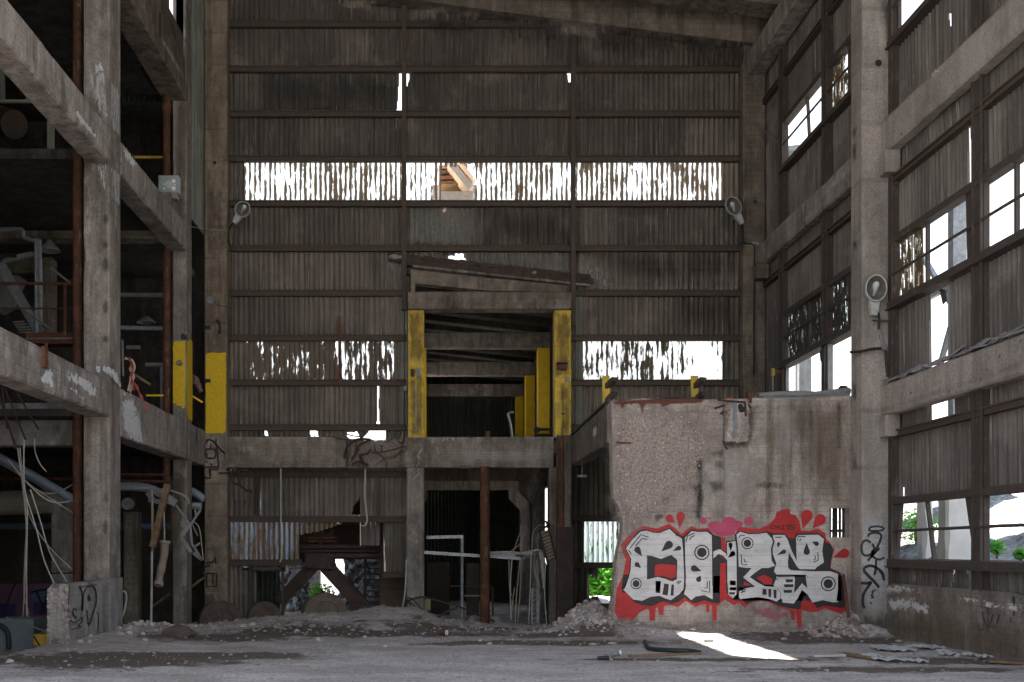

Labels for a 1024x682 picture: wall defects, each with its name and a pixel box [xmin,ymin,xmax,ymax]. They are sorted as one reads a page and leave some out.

peeling [41,369,53,388]
peeling [68,340,144,444]
corrosion [615,399,703,413]
leakage [695,461,719,518]